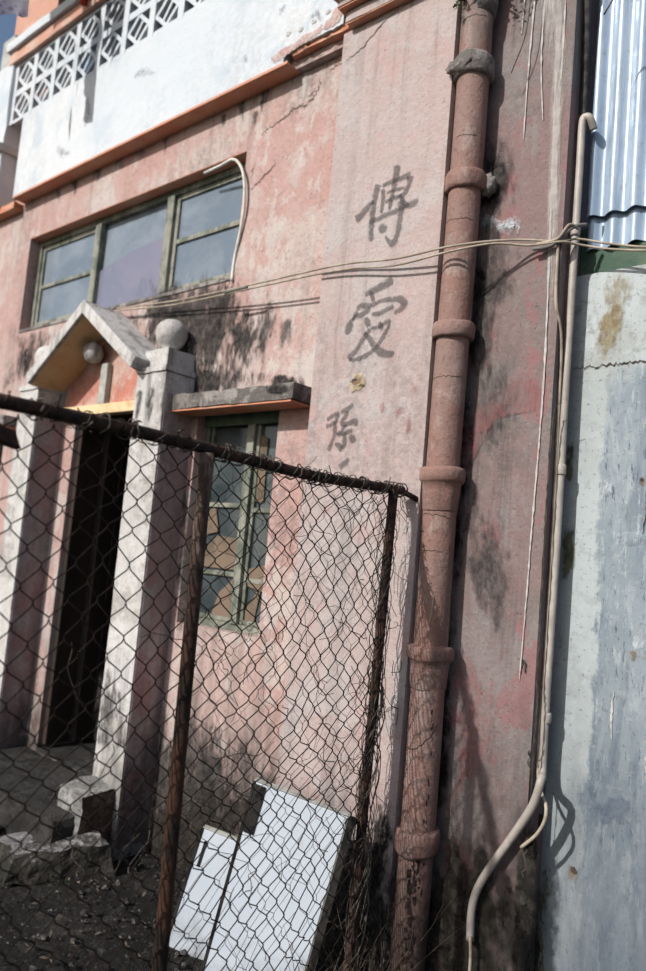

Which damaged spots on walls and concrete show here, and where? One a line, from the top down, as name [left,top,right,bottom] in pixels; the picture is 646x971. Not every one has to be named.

peeling [271,8,342,63]
crack [261,6,400,135]
water stain [133,277,291,393]
water stain [461,401,474,495]
water stain [453,510,465,578]
water stain [437,684,451,807]
water stain [425,836,520,971]